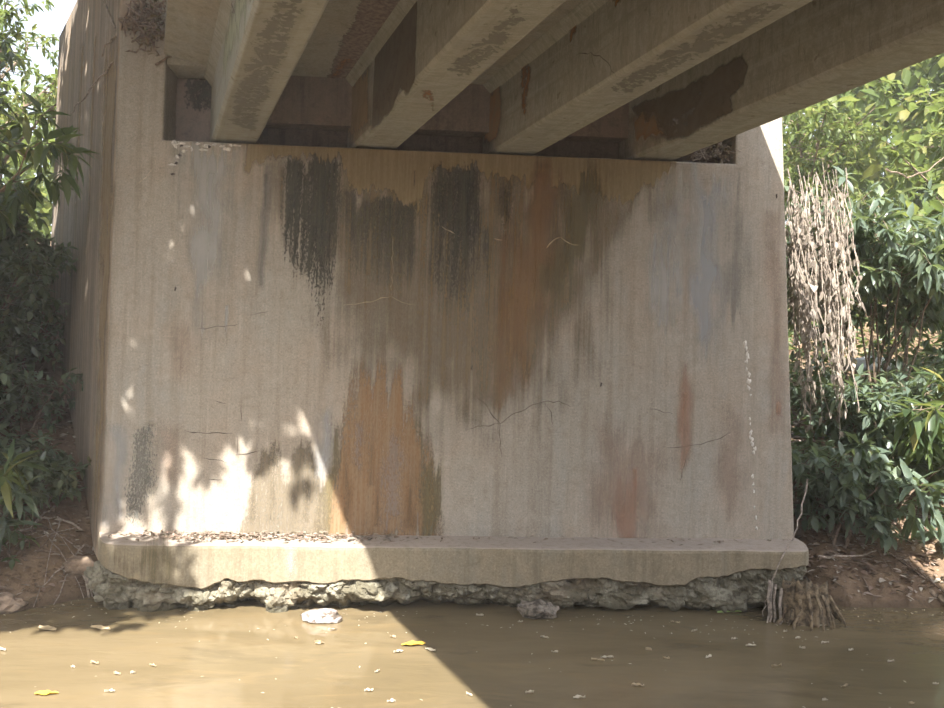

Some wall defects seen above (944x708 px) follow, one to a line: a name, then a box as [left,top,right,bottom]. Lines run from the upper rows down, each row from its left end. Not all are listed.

water stain [348,1,417,136]
corrosion [314,361,441,536]
water stain [240,86,676,536]
crack [471,395,569,456]
water stain [743,340,752,396]
spalling [83,560,807,613]